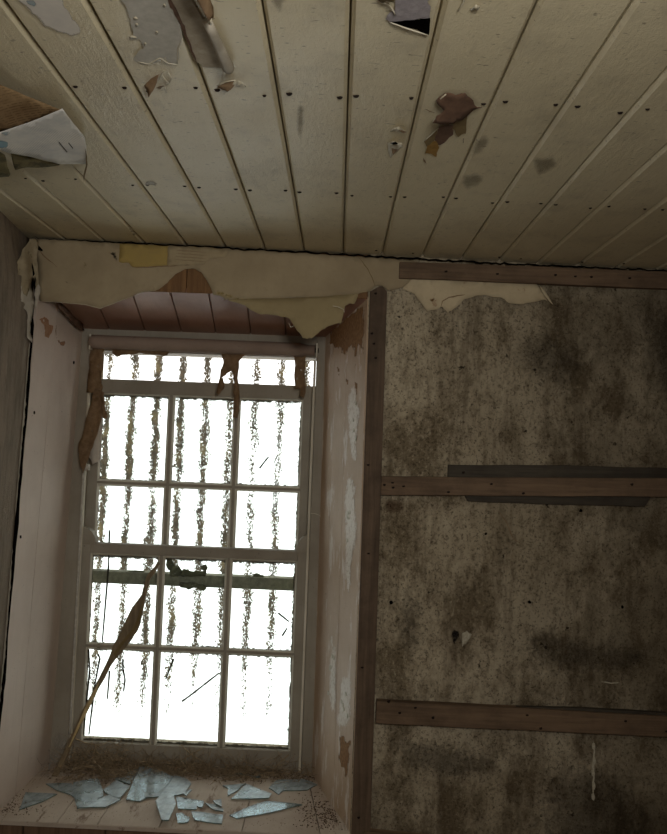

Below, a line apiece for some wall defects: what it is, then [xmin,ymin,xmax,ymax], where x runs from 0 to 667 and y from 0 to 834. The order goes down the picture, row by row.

peeling [20,0,80,35]
peeling [122,0,246,97]
peeling [423,93,482,163]
peeling [330,307,365,356]
peeling [347,380,360,461]
peeling [344,478,357,592]
peeling [328,636,351,776]